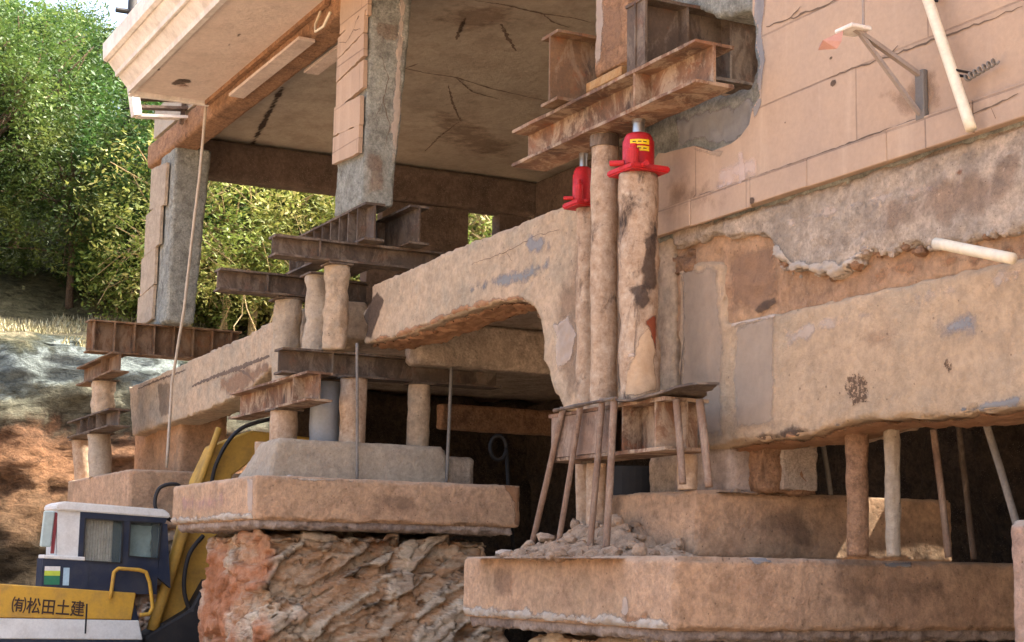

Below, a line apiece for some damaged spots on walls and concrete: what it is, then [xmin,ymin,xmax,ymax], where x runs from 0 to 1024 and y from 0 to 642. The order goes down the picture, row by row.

crack [455,0,588,51]
crack [252,87,284,144]
crack [375,57,546,151]
flaking render [672,125,1024,282]
spalling [364,293,540,351]
water stain [845,374,869,405]